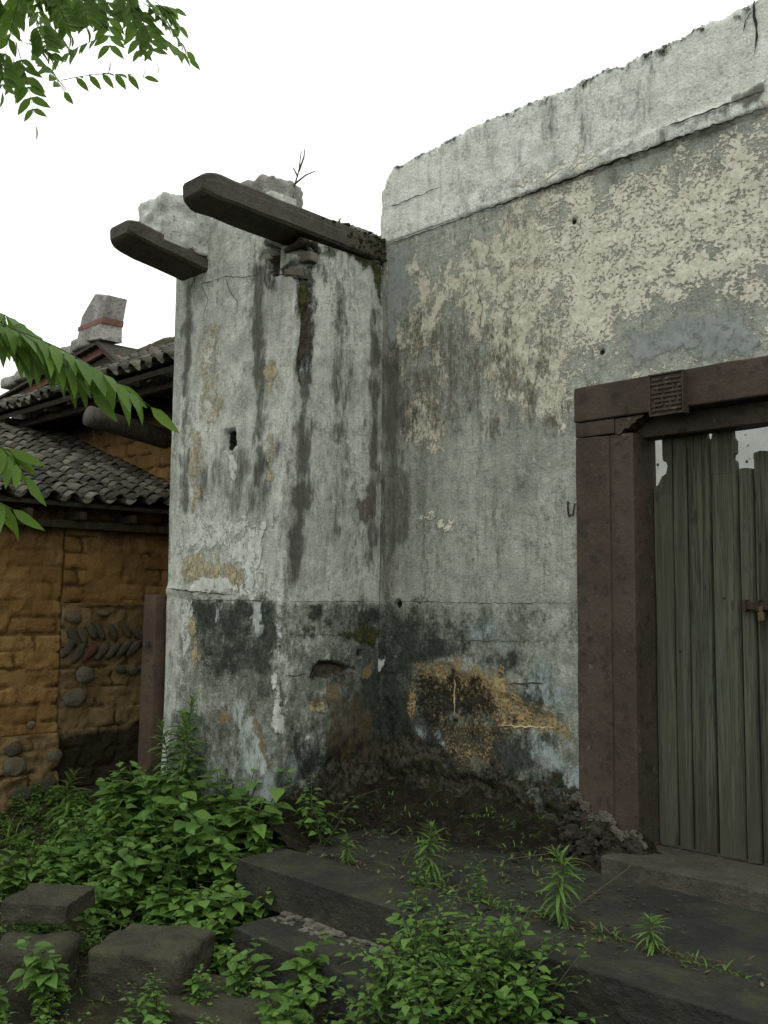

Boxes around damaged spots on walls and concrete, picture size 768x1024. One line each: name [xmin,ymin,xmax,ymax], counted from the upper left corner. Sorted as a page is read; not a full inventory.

crack [743,0,758,53]
crack [194,273,262,312]
leakage [295,246,337,383]
peeling [384,55,768,464]
flaking render [180,549,250,594]
leakage [193,596,277,678]
spalling [304,659,385,714]
leakage [238,598,579,816]
flaking render [407,655,575,773]